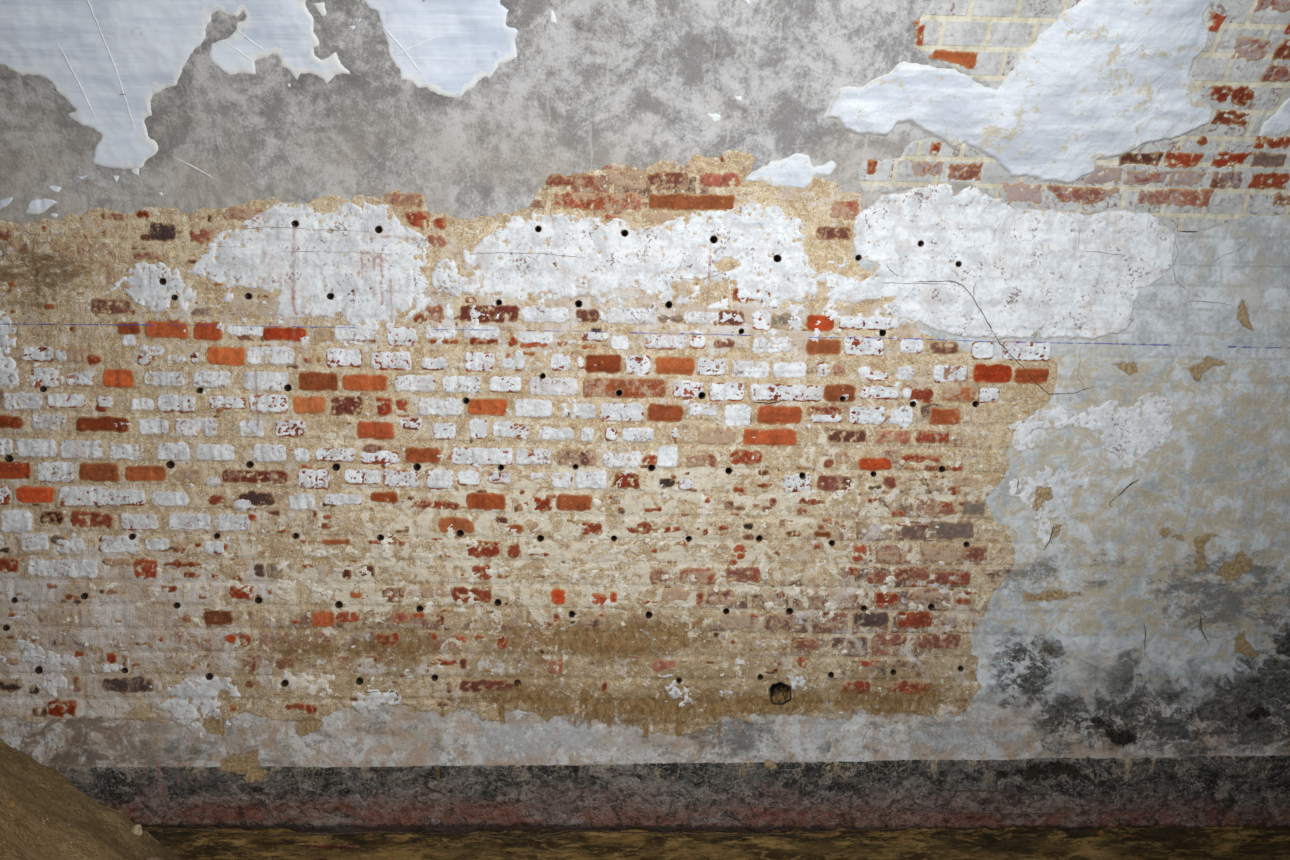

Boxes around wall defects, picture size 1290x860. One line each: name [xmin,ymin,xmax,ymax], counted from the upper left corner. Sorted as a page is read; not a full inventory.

peeling [0,0,1290,232]
flaking render [1237,300,1254,330]
flaking render [1109,362,1138,376]
flaking render [1188,356,1226,381]
flaking render [0,150,1058,737]
flaking render [1160,527,1253,581]
flaking render [1022,590,1081,603]
leakage [440,553,1290,761]
flaking render [1234,632,1259,657]
spalling [1247,707,1276,722]